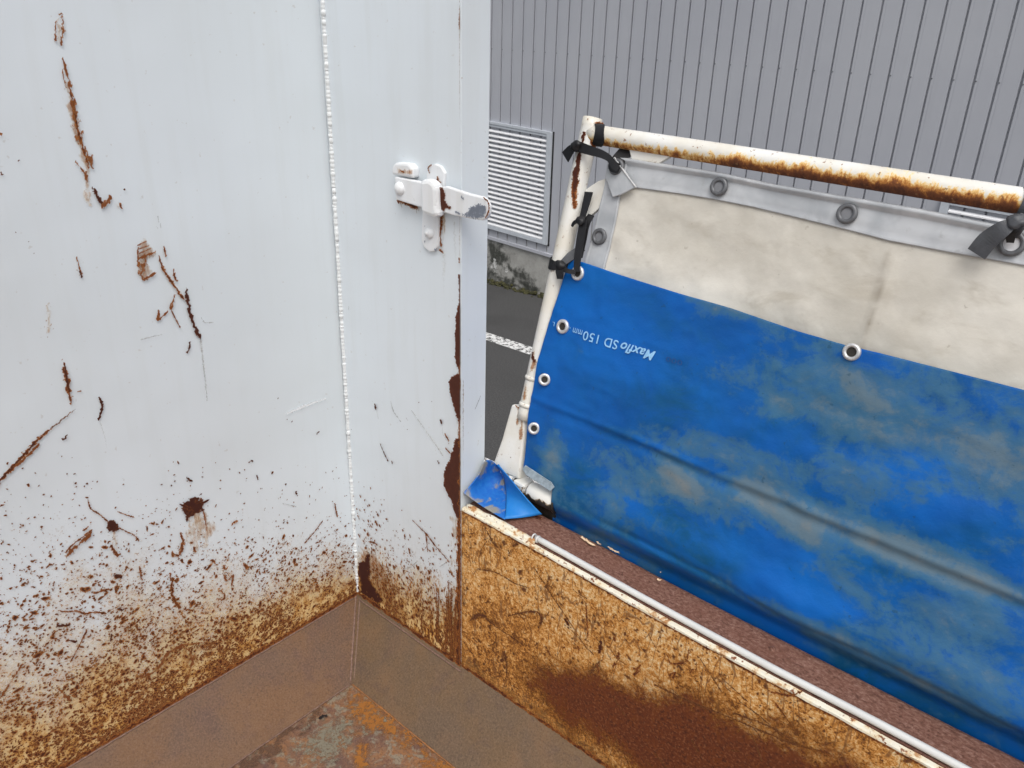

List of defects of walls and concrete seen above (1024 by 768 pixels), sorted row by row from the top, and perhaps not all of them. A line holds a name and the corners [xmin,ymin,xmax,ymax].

corrosion [54,13,123,209]
corrosion [571,119,603,209]
corrosion [137,241,156,281]
corrosion [62,359,81,405]
corrosion [0,461,926,768]